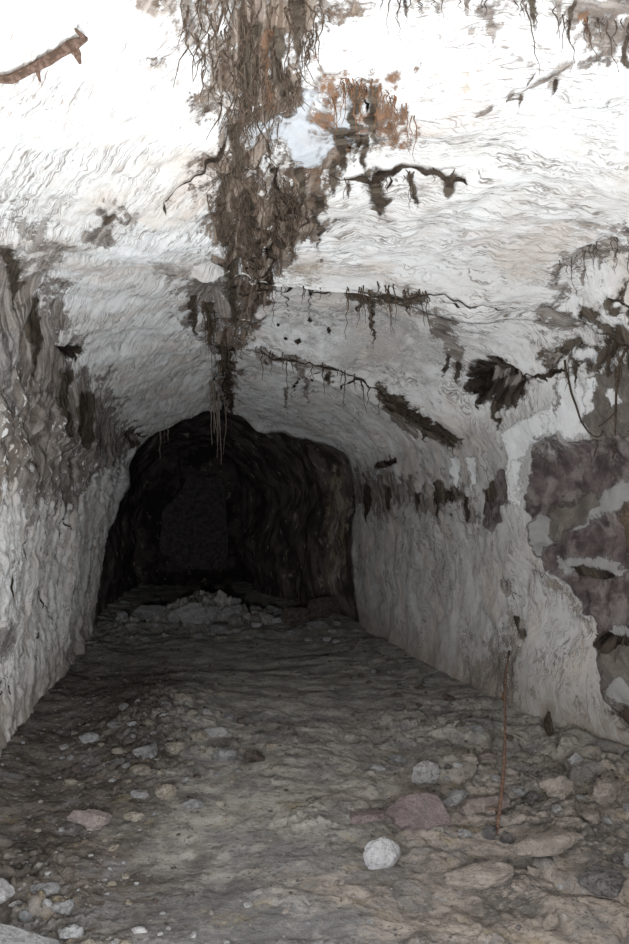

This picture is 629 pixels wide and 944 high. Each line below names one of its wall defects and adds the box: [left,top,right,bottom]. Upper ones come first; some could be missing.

leakage [135,0,393,417]
leakage [406,174,420,205]
leakage [443,174,457,199]
leakage [0,248,95,485]
peeling [524,346,629,732]